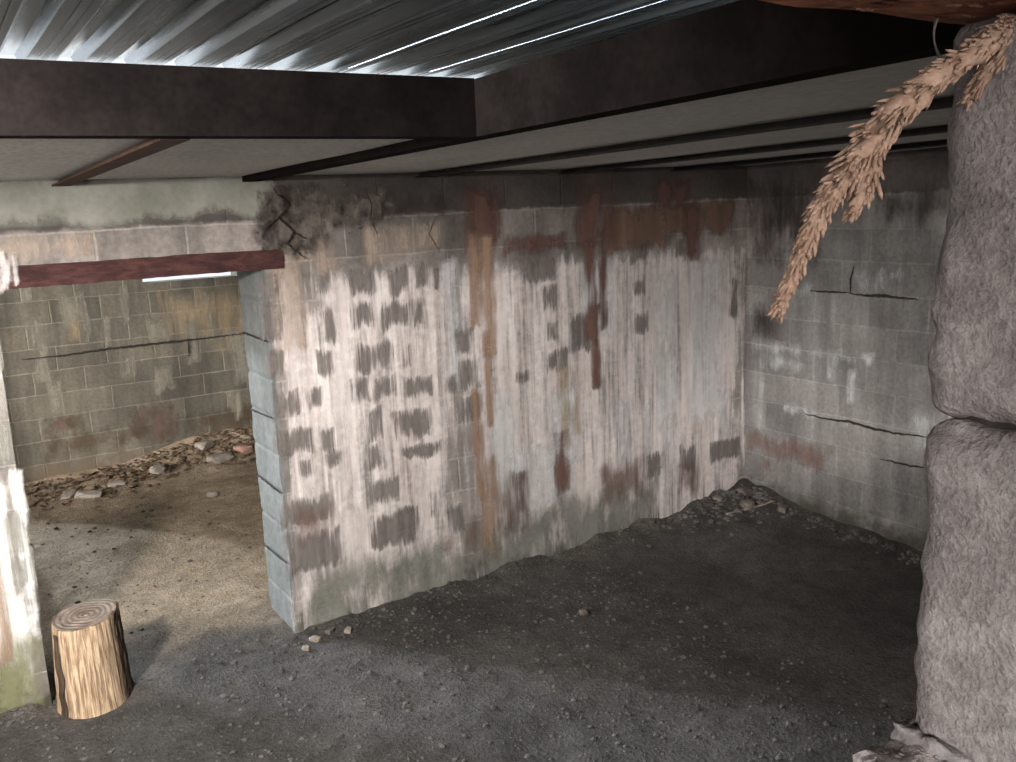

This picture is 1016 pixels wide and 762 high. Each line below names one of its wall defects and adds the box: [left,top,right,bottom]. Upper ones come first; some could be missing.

corrosion [465,180,735,553]
crack [805,413,926,438]
crack [880,459,924,468]
corrosion [0,591,11,665]